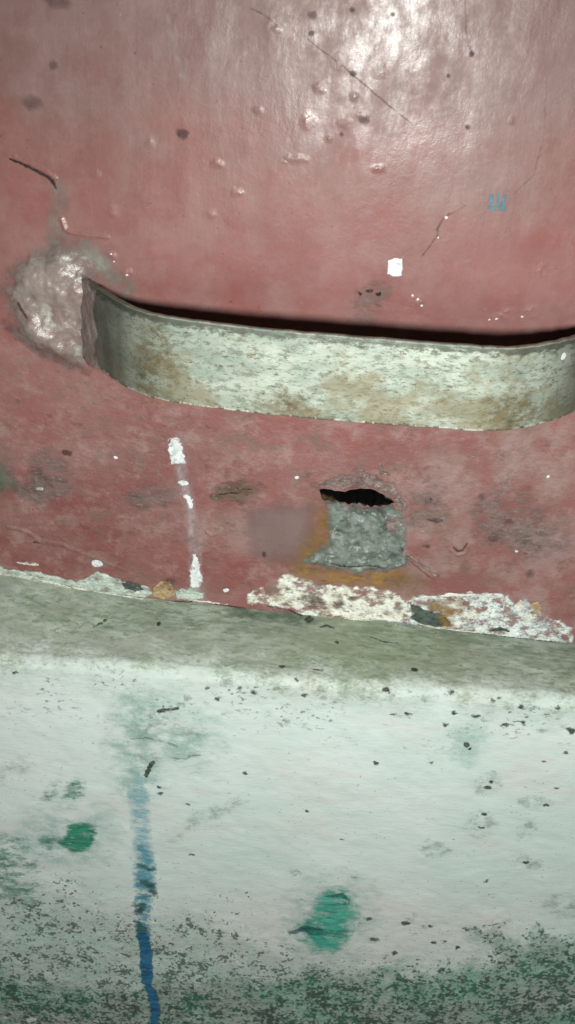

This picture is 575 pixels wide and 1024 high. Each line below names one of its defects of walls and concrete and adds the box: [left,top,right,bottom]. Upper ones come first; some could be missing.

corrosion [296,564,403,586]
flaking render [247,463,574,643]